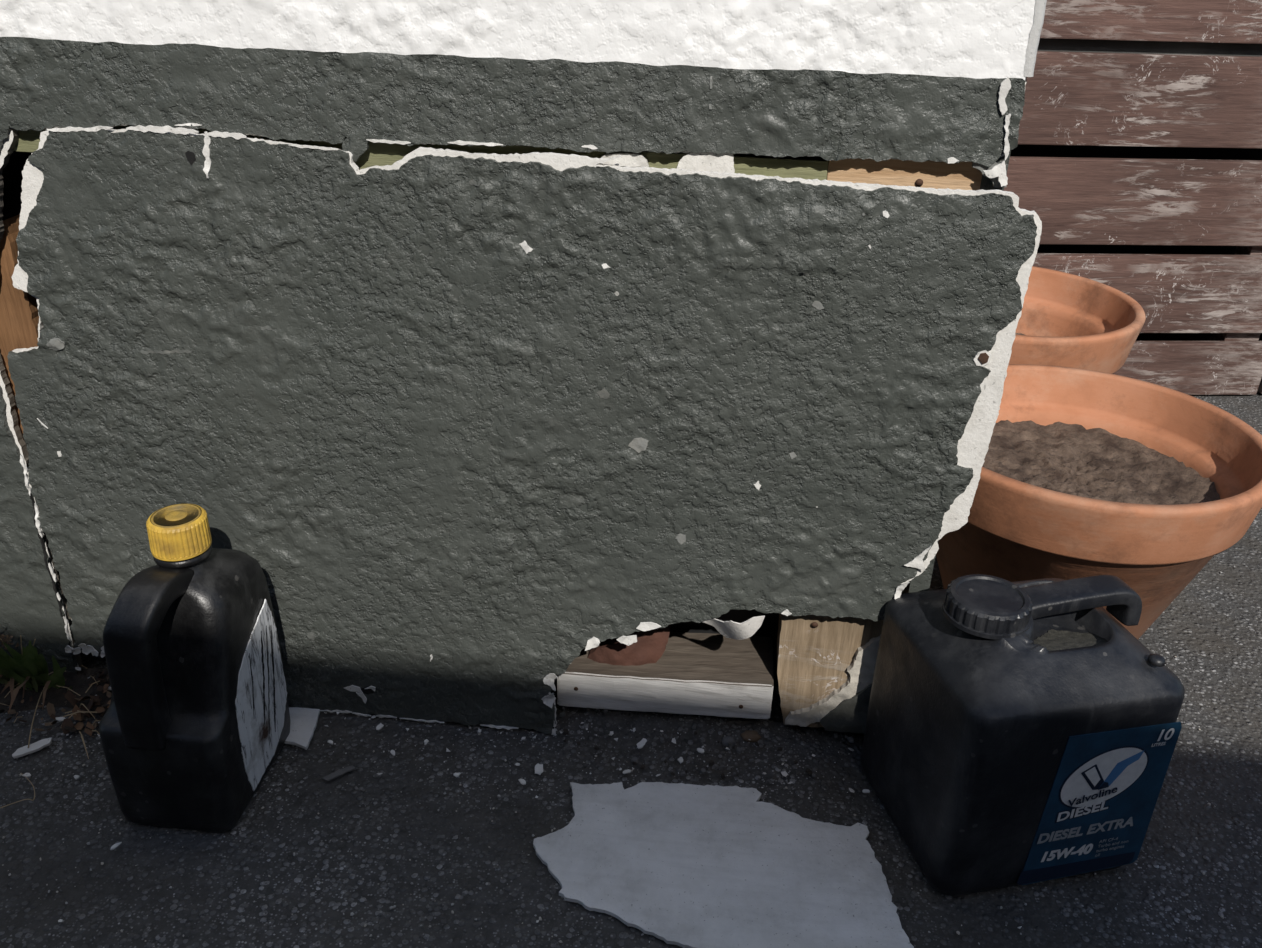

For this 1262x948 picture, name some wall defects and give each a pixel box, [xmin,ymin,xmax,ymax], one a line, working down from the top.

crack [47,123,247,178]
crack [289,143,338,151]
crack [366,138,411,146]
crack [447,139,503,147]
crack [582,145,735,173]
crack [947,156,959,164]
crack [20,455,71,646]
peeling [904,546,931,570]
peeling [894,582,910,599]
spalling [585,637,600,651]
spalling [616,622,661,646]
spalling [541,673,558,736]